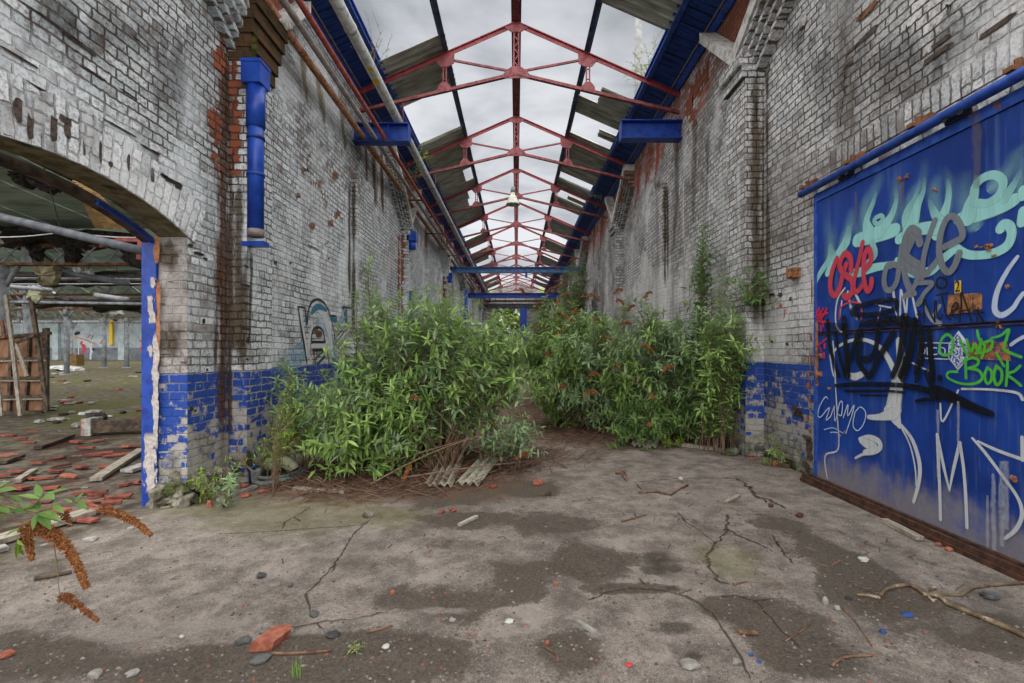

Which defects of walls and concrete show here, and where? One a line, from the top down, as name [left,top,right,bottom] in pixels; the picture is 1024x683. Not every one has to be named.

peeling [207,26,243,178]
rust [301,58,325,121]
rust [214,41,235,429]
rust [365,146,384,208]
spalling [142,277,269,509]
spalling [764,354,813,469]
crack [733,478,785,508]
crack [219,507,383,629]
crack [587,512,800,680]